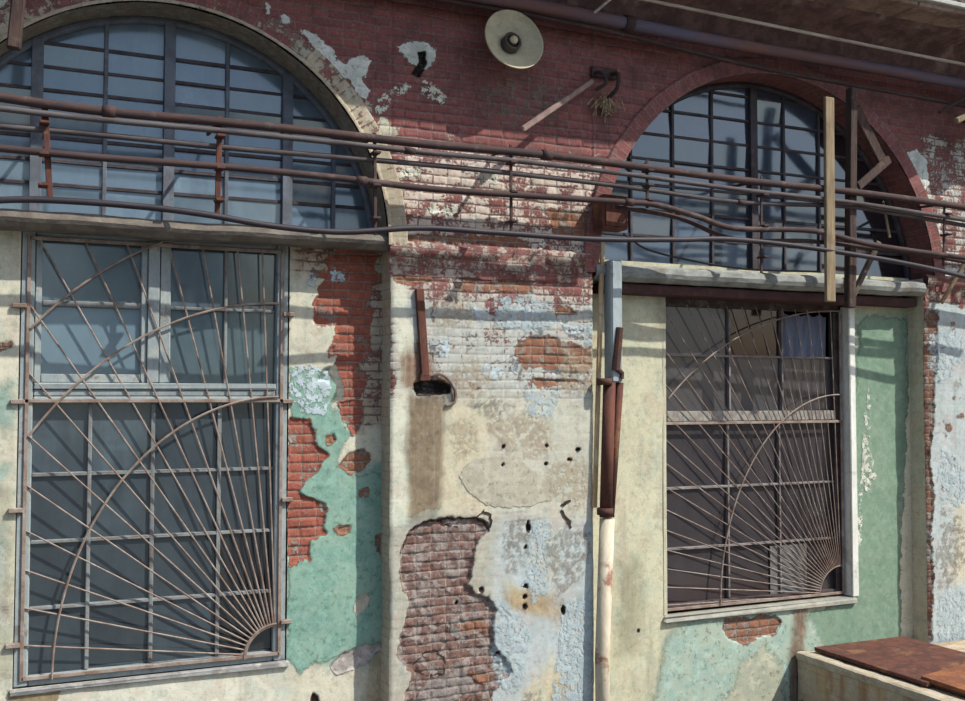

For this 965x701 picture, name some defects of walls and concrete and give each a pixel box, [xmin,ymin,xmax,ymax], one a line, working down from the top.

spalling [373,51,427,114]
flaking render [408,207,589,252]
flaking render [307,249,432,435]
hole [414,380,451,396]
flaking render [439,280,593,420]
flaking render [287,417,352,567]
flaking render [336,448,371,475]
leakage [407,396,442,516]
flaking render [923,309,965,643]
flaking render [397,516,594,701]
flaking render [722,613,782,646]